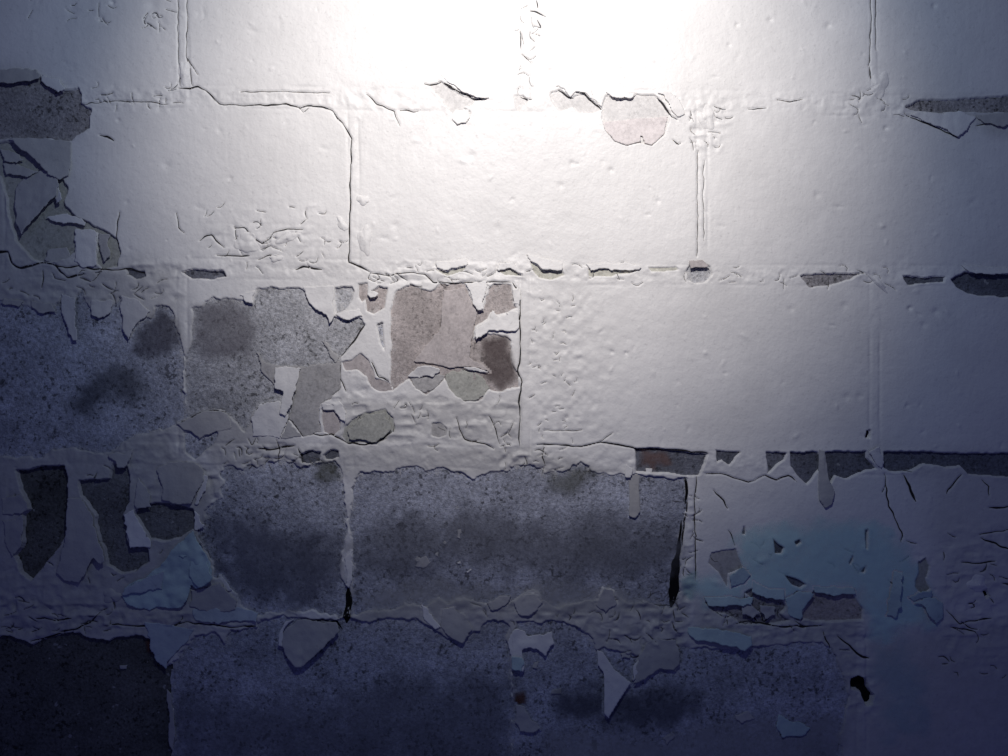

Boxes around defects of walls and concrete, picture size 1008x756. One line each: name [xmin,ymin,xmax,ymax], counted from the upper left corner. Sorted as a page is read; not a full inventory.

peeling [551,83,685,146]
peeling [906,96,1008,137]
peeling [0,68,146,279]
peeling [903,265,1008,297]
crack [83,0,802,663]
leakage [485,339,512,388]
peeling [0,254,862,756]
peeling [766,446,1008,508]
crack [882,470,916,559]
crack [943,475,1008,642]